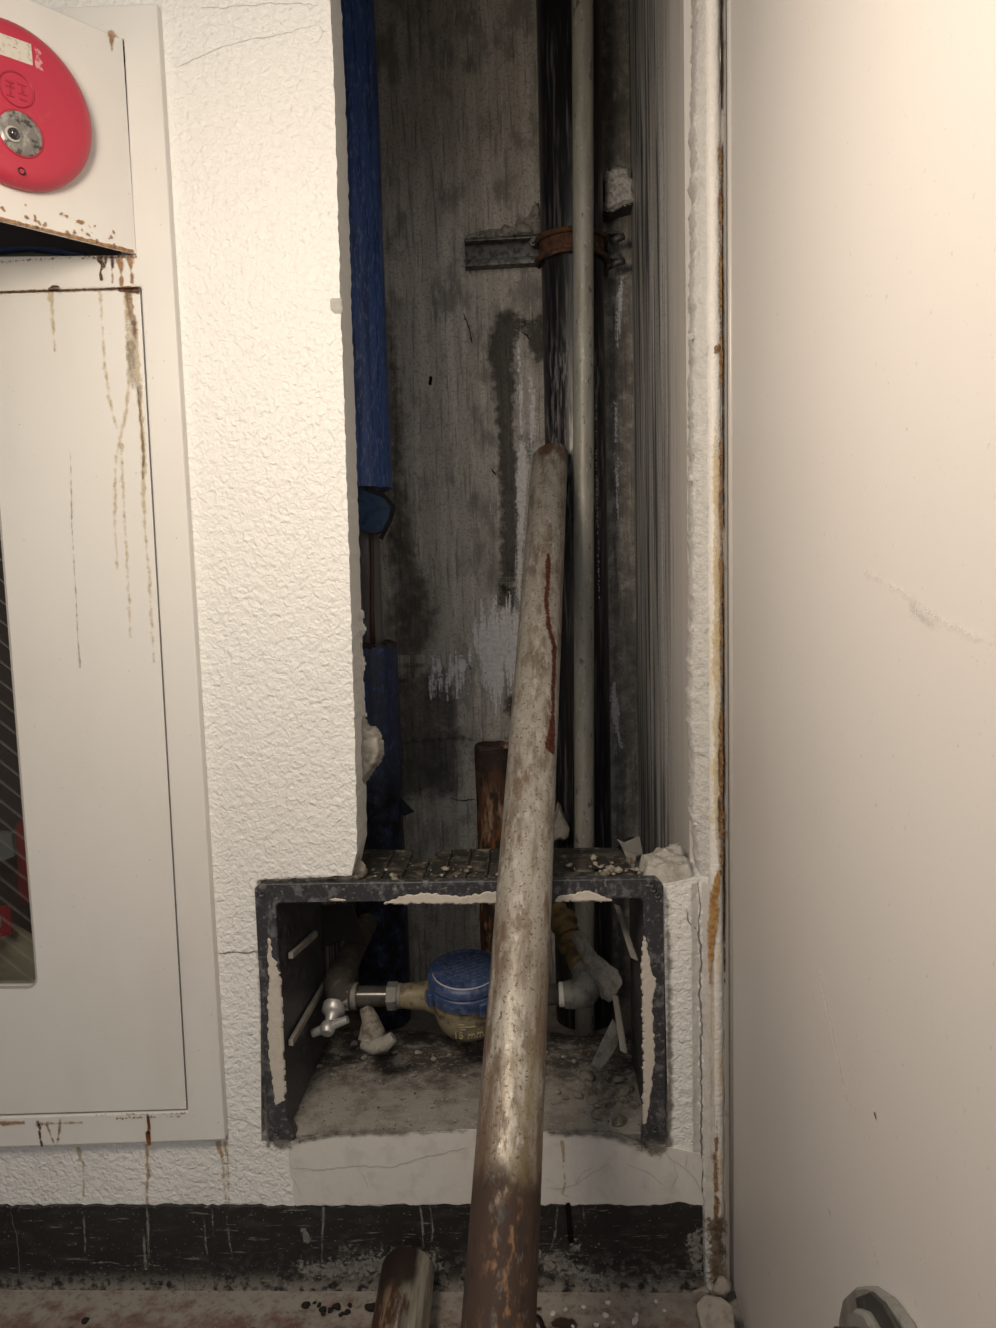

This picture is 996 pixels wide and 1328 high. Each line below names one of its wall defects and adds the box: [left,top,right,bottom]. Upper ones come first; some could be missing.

crack [175,2,323,68]
corrosion [714,141,723,387]
water stain [391,310,543,795]
corrosion [707,424,725,1095]
corrosion [0,1120,80,1147]
corrosion [96,1112,186,1204]
corrosion [705,1121,726,1285]